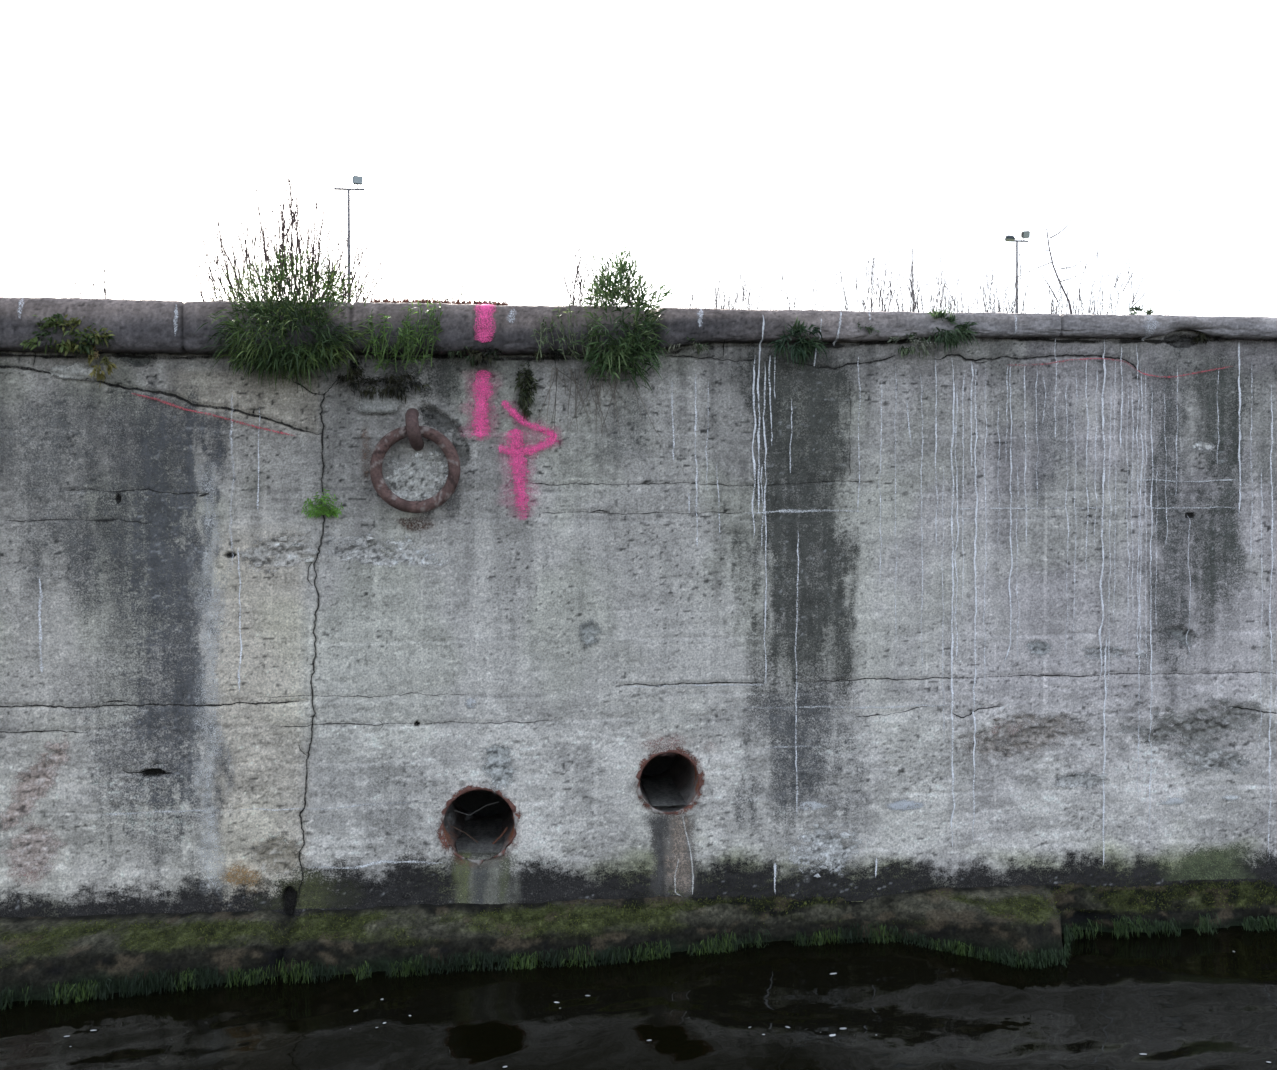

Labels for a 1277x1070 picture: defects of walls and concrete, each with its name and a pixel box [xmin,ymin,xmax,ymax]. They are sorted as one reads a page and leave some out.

crack [364,353,620,361]
crack [532,337,1273,515]
crack [0,352,548,904]
leakage [0,313,1277,918]
rust [639,735,705,816]